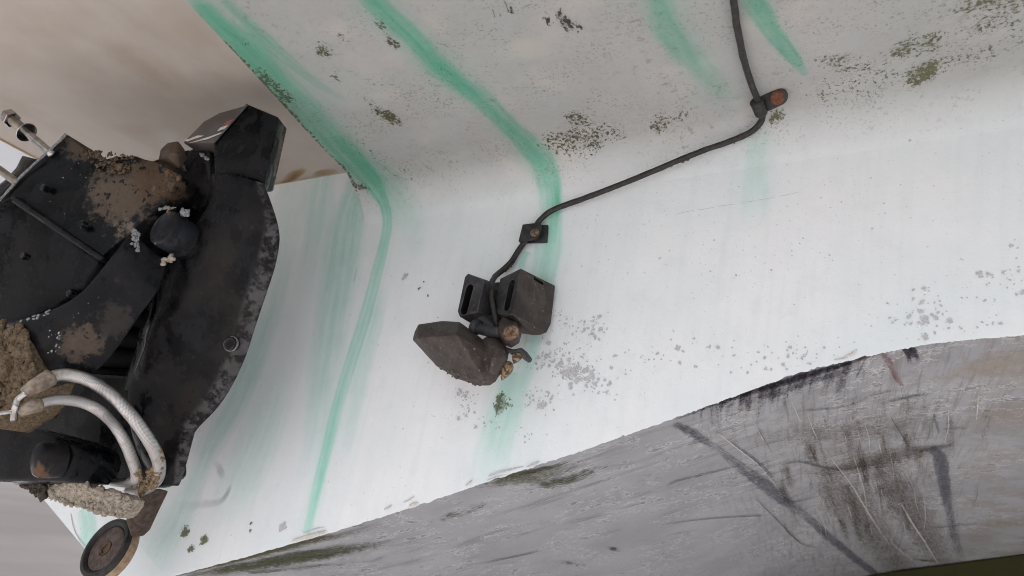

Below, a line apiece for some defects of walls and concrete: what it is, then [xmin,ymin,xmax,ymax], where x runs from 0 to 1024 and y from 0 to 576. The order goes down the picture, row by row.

water stain [543,9,583,32]
water stain [815,0,1024,107]
water stain [364,98,401,127]
water stain [537,112,625,156]